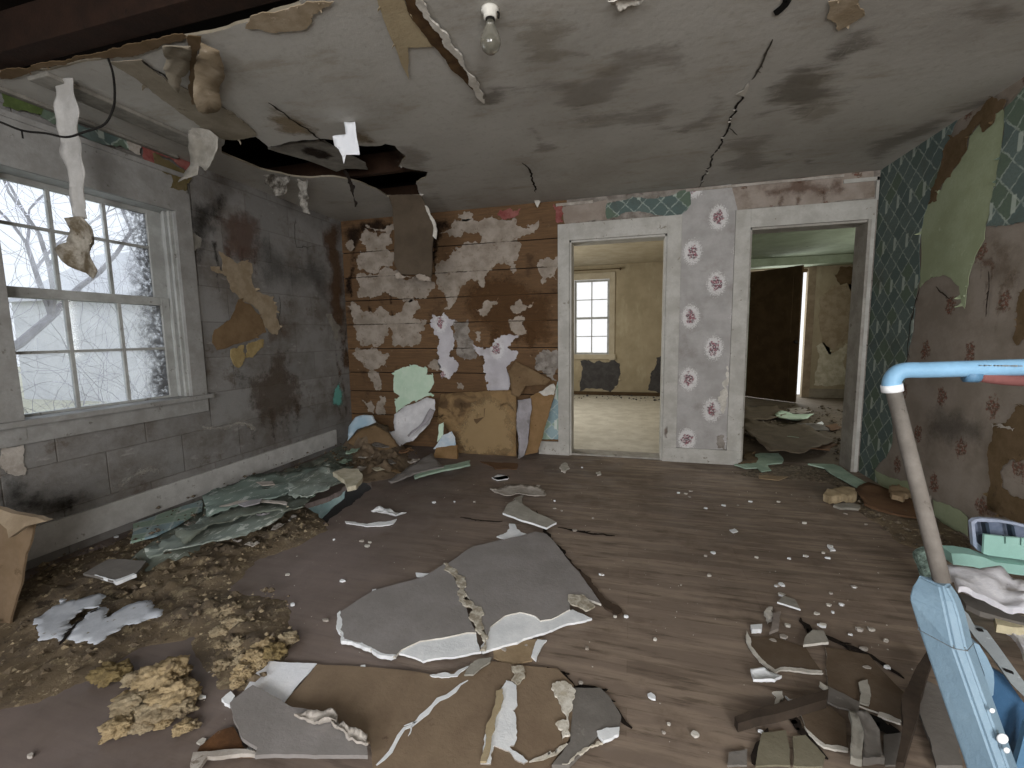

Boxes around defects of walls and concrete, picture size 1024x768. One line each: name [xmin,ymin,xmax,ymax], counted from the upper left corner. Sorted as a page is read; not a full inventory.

peeling [245,1,334,34]
peeling [377,0,433,79]
peeling [111,59,257,145]
crack [699,0,792,187]
peeling [914,109,1004,309]
flaking render [230,339,264,368]
damp [234,356,301,430]
peeling [378,359,435,413]
spalling [579,360,621,392]